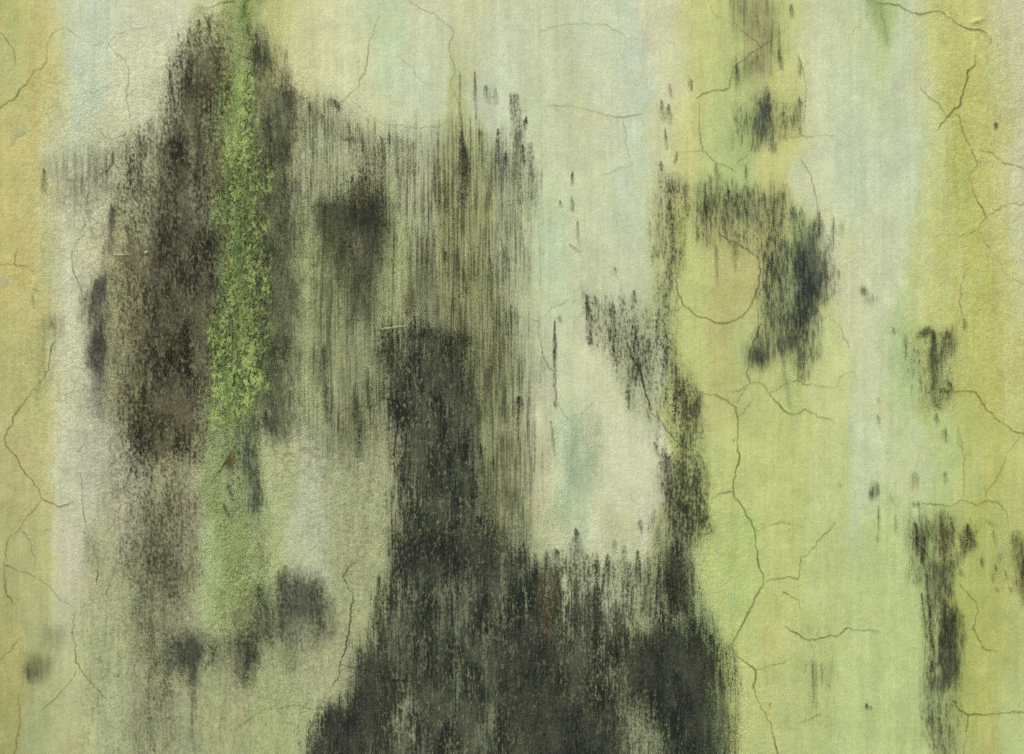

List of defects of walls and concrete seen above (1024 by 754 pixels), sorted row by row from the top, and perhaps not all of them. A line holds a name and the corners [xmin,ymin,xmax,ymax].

damp [735,90,802,148]
crack [937,67,972,142]
damp [84,13,334,718]
damp [306,163,840,754]
crack [676,235,832,698]
damp [905,318,967,416]
damp [909,515,974,754]